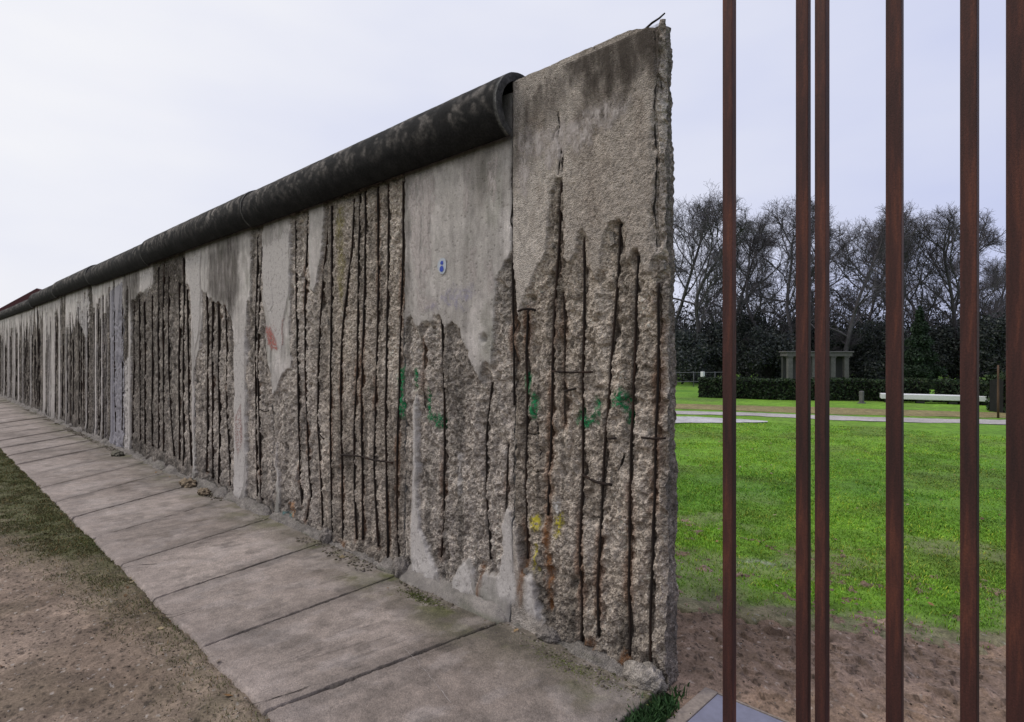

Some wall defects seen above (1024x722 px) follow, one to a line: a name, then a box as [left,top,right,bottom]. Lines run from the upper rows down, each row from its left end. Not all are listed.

leakage [566,23,659,96]
spalling [0,13,679,695]
rust [542,519,555,608]